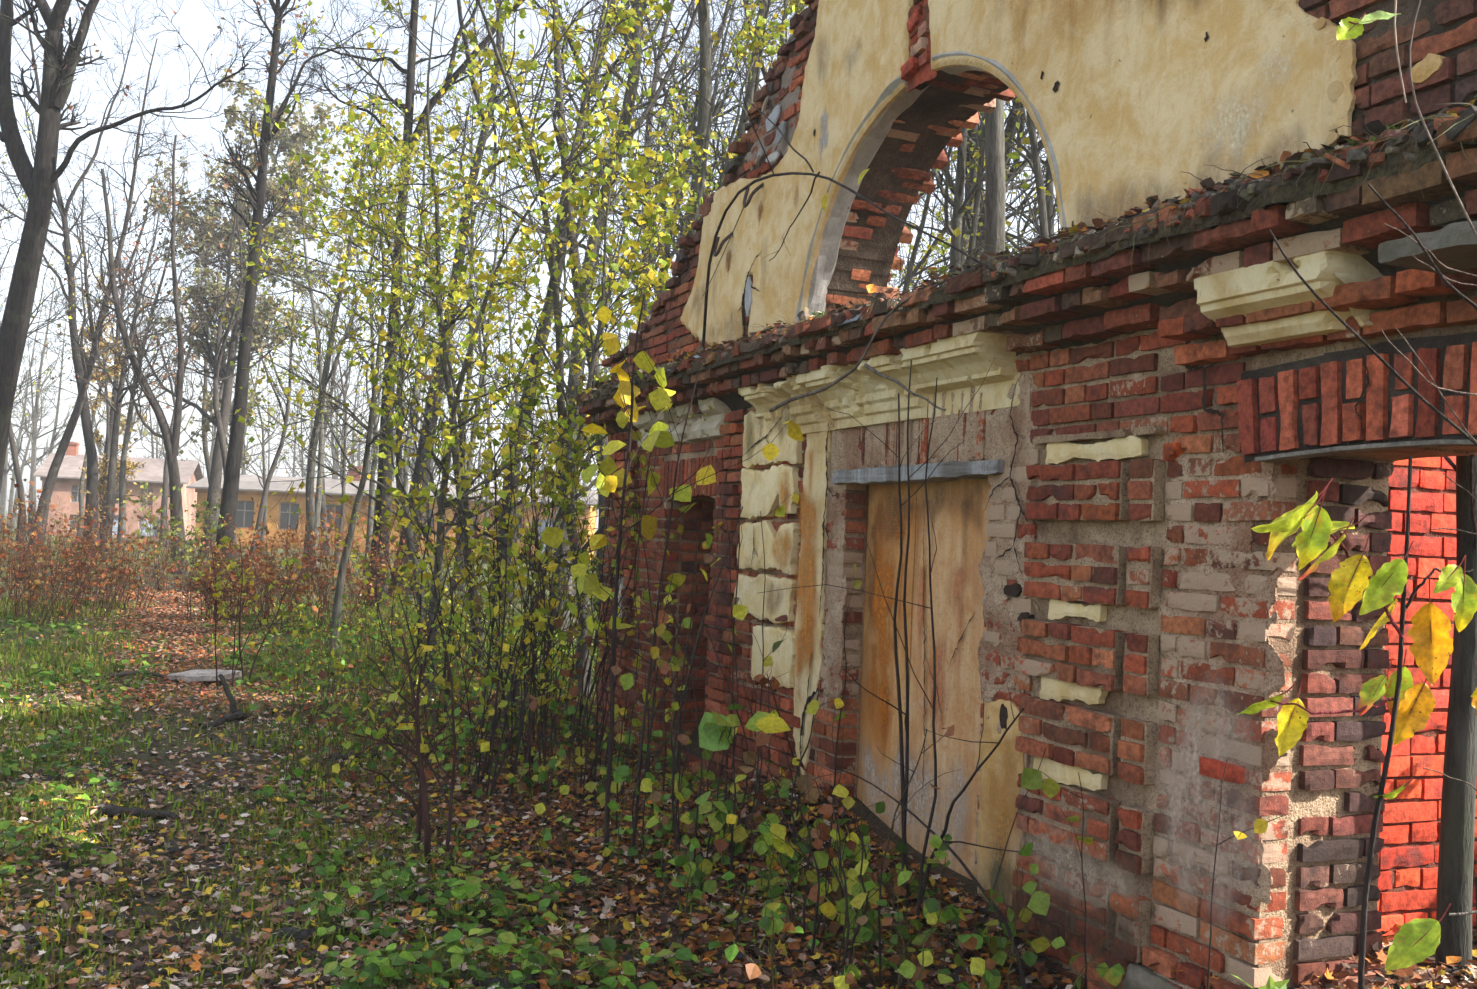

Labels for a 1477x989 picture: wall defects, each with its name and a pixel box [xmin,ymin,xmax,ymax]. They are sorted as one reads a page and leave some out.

flaking render [1268,0,1358,145]
spalling [745,58,801,171]
spalling [1163,443,1185,461]
spalling [1002,583,1035,628]
spalling [997,704,1008,734]
spalling [1199,757,1250,784]